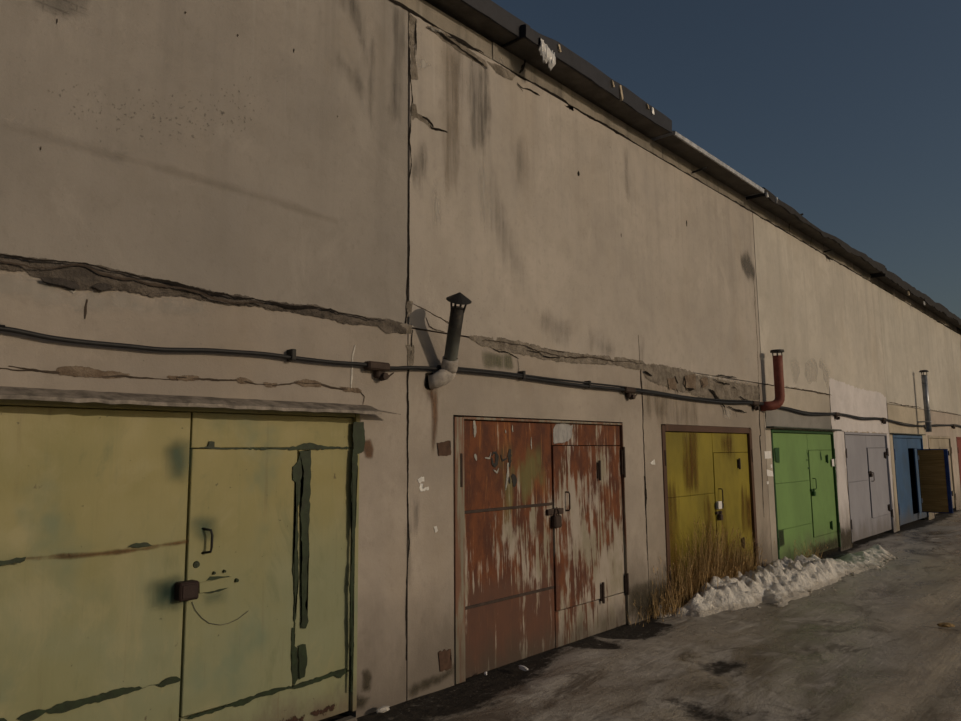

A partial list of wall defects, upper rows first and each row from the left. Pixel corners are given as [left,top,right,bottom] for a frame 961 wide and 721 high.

crack [495,60,961,335]
flaking render [0,253,407,334]
crack [389,0,477,661]
water stain [741,256,754,277]
flaking render [0,345,365,403]
flaking render [470,335,760,417]